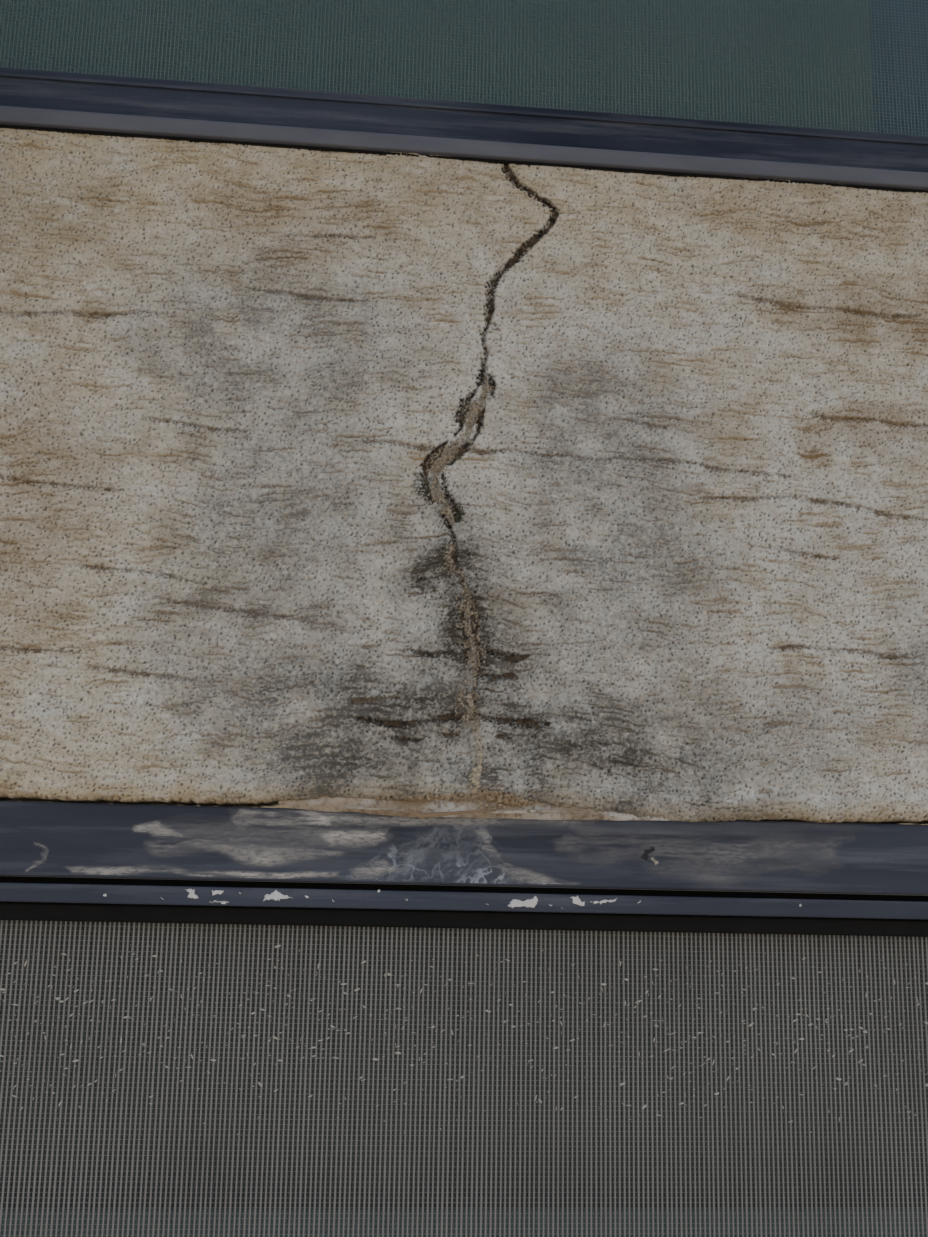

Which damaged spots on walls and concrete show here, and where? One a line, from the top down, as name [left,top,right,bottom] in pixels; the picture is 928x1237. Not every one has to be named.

crack [352,165,558,744]
leakage [203,539,718,804]
leakage [135,823,179,836]
leakage [232,810,489,865]
leakage [599,796,647,816]